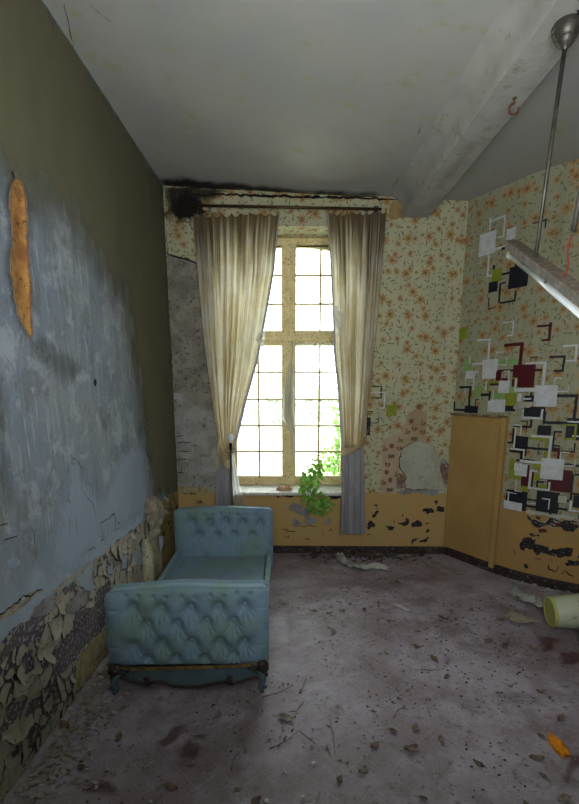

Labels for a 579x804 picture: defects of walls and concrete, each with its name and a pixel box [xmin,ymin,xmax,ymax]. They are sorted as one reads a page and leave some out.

peeling [386,500,444,546]
peeling [519,515,579,566]
peeling [0,491,179,804]